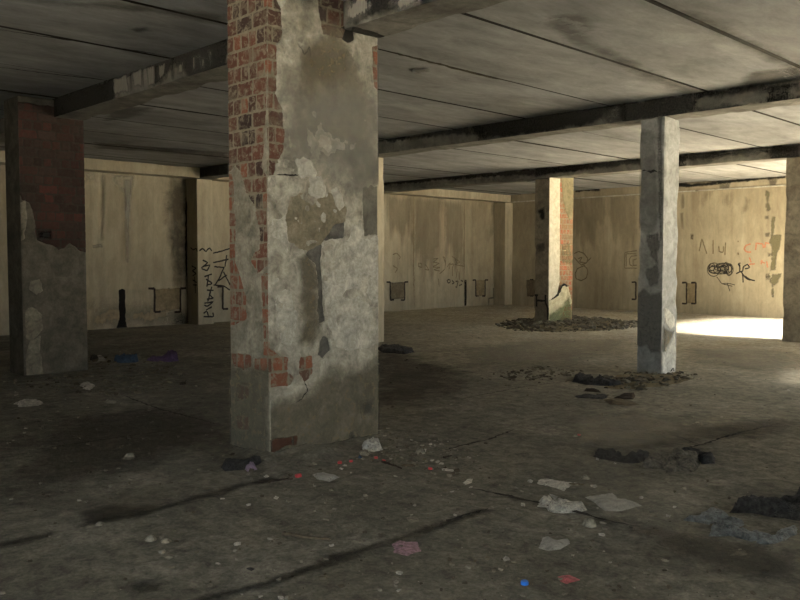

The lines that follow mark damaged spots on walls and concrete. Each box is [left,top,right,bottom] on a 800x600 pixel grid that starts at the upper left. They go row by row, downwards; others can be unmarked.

flaking render [18,102,86,252]
flaking render [227,0,384,387]
flaking render [549,178,573,319]
flaking render [25,307,43,375]